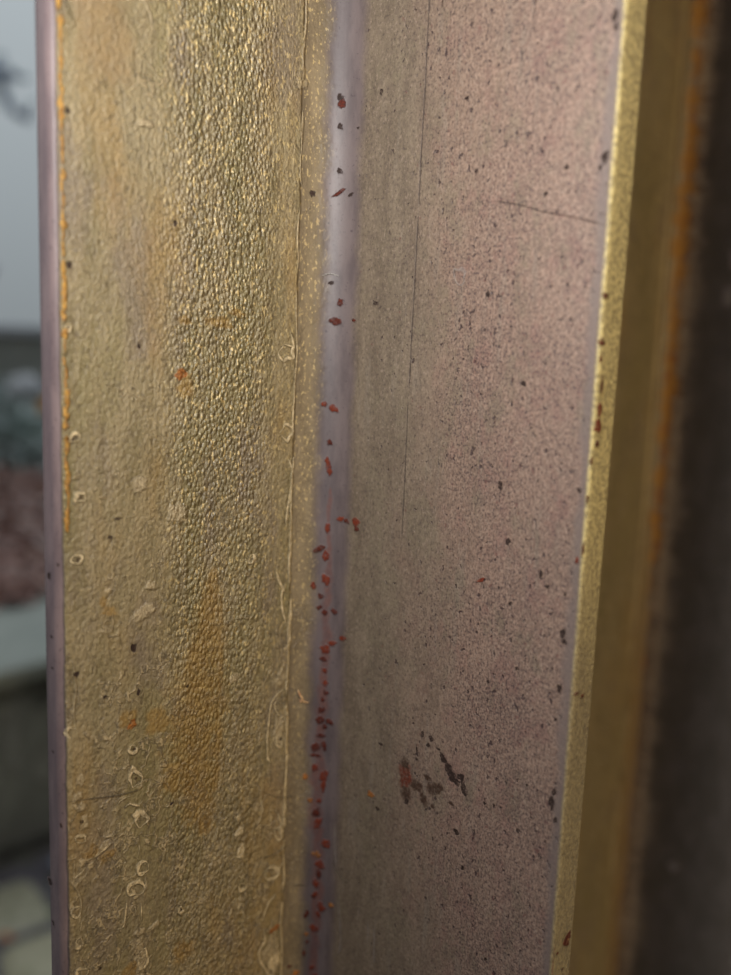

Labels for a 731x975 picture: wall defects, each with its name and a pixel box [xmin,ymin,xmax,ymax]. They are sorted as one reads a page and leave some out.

rust [55,0,72,536]
rust [286,438,362,975]